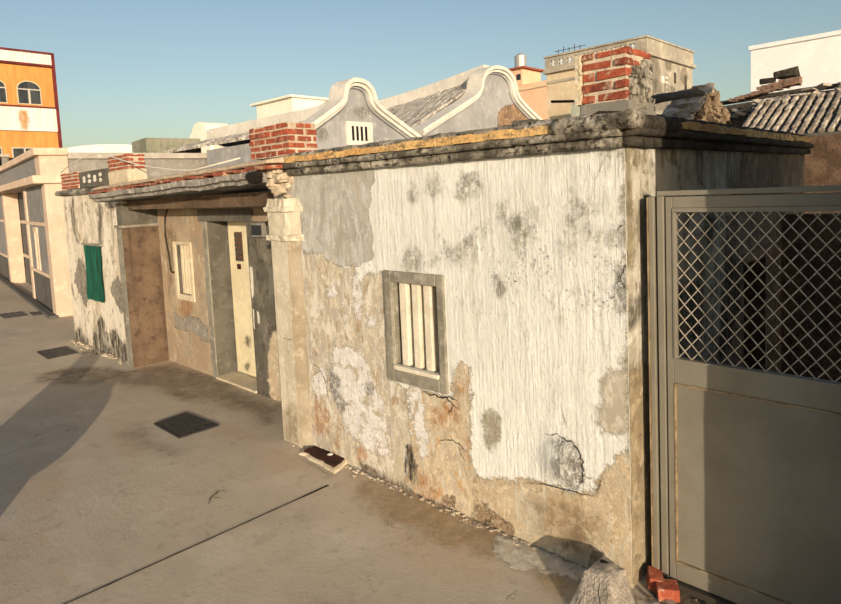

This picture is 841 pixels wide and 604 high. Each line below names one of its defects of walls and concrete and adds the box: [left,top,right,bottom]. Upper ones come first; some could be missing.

water stain [75,317,127,361]
crack [423,391,457,414]
peeling [274,169,632,588]
crack [528,409,603,497]